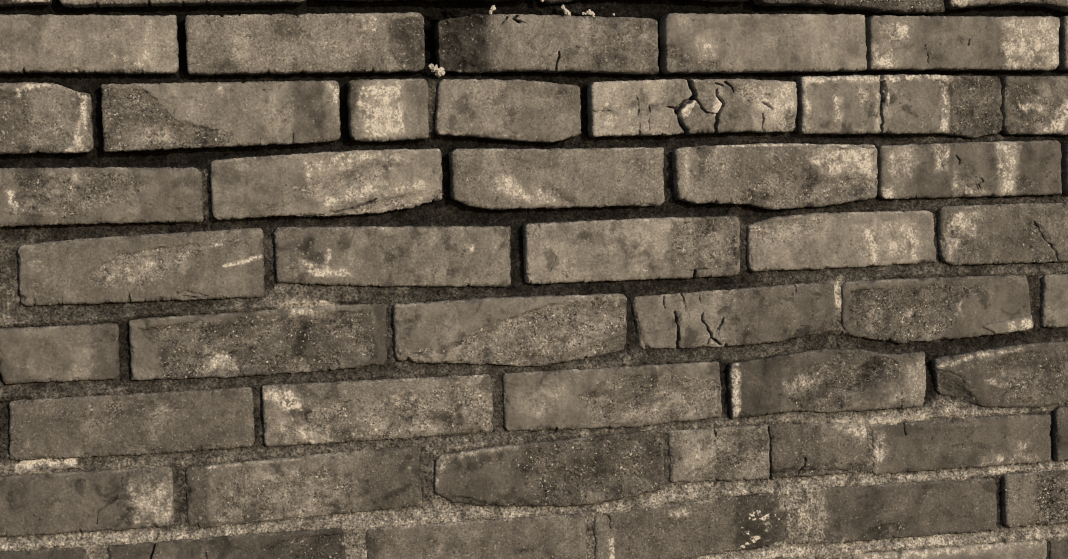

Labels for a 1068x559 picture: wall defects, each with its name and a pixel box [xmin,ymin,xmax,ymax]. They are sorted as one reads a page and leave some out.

crack [501,15,525,25]
crack [636,79,734,135]
crack [1033,221,1060,262]
crack [662,268,724,348]
crack [96,477,135,525]